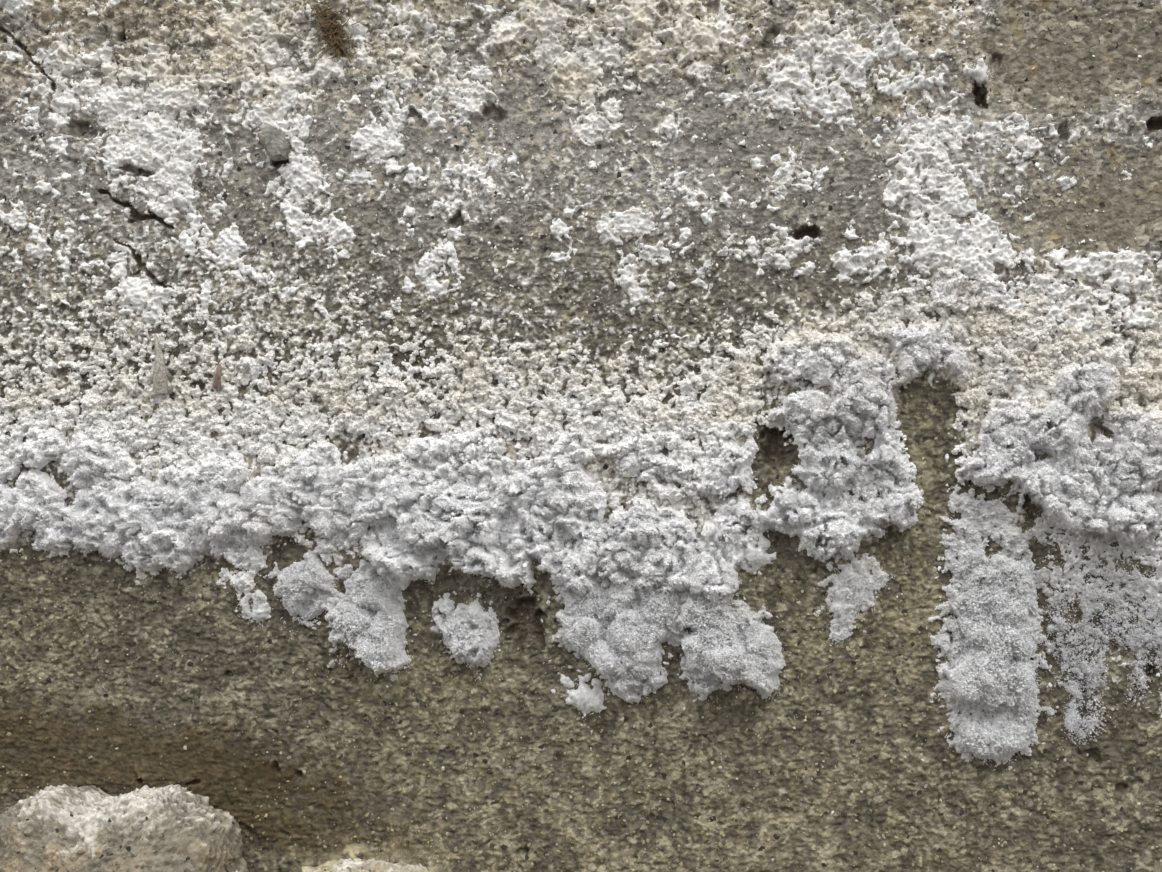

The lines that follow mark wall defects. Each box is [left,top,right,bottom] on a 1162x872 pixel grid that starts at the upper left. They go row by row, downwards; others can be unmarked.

crack [98,189,174,289]
leakage [0,244,1162,746]